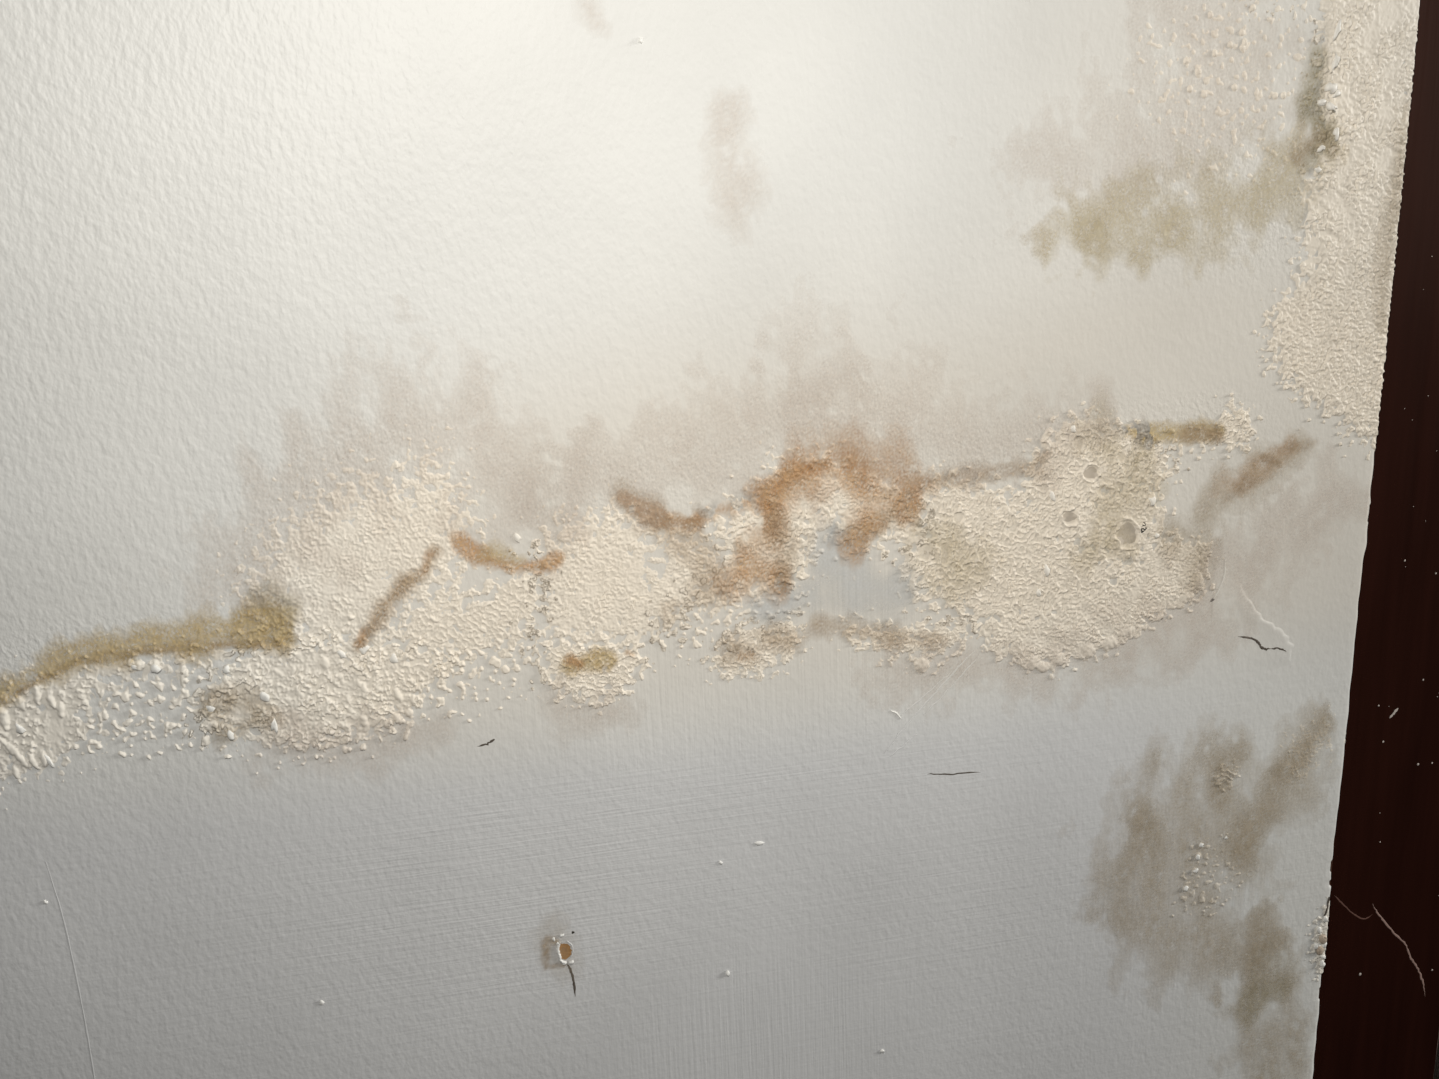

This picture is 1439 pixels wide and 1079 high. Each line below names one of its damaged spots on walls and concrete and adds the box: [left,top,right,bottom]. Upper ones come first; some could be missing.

damp [1128,424,1223,441]
damp [0,595,290,702]